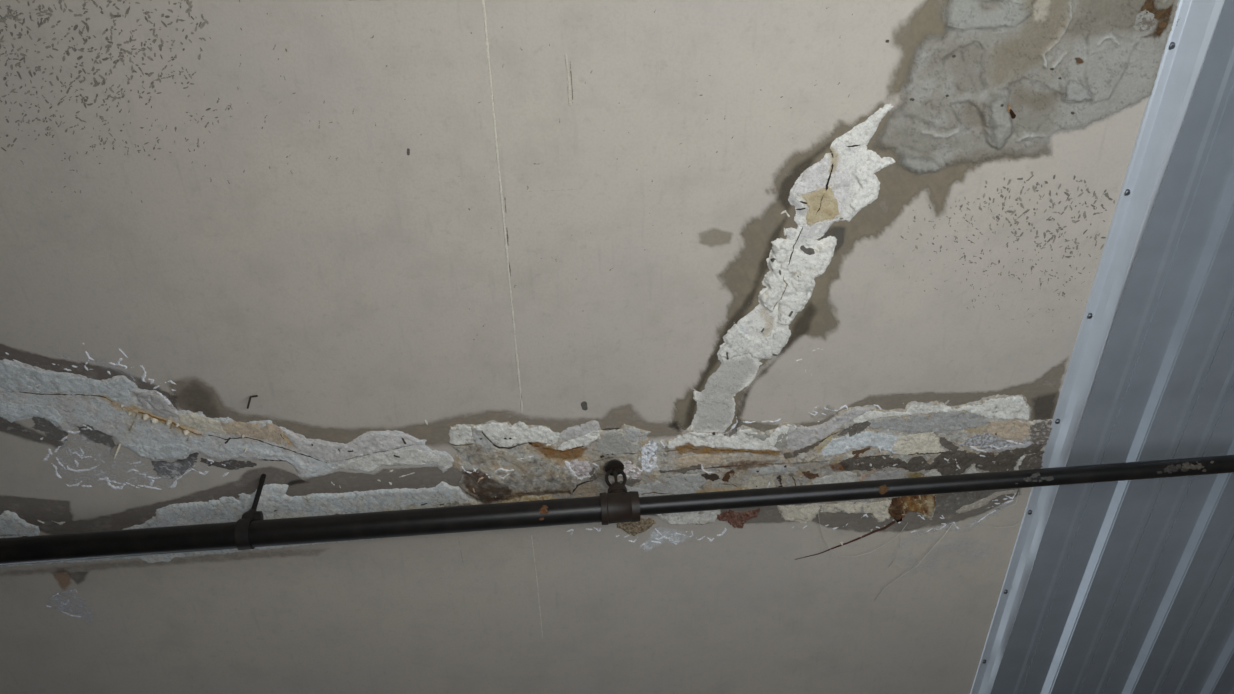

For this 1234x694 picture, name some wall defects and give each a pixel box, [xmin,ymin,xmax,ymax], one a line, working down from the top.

leakage [0,0,1065,538]
corrosion [531,442,586,459]
corrosion [675,443,779,470]
peeling [956,489,1018,513]
corrosion [717,508,760,529]
leakage [616,488,1020,549]
leakage [0,537,391,619]